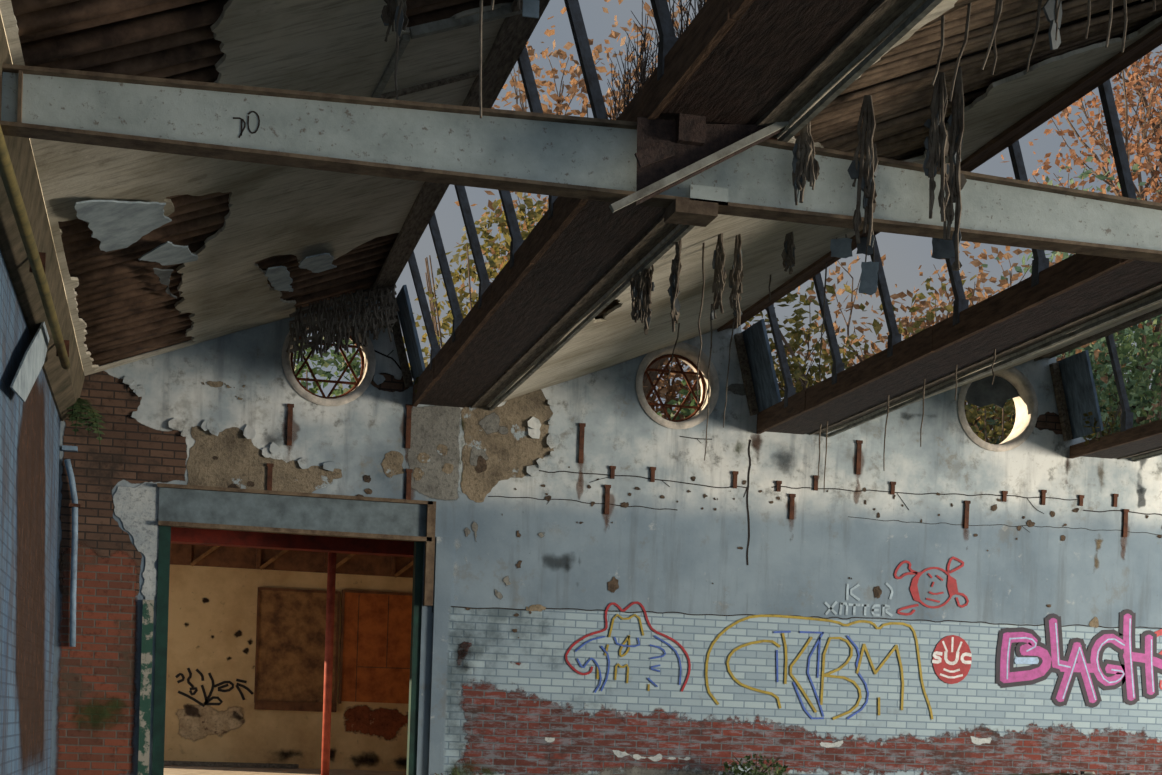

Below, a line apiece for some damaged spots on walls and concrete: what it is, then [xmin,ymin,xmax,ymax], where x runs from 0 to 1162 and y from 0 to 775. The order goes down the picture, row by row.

peeling [1043,0,1062,50]
peeling [75,200,172,252]
peeling [139,241,198,299]
peeling [265,253,337,292]
peeling [59,371,342,595]
peeling [16,378,46,769]
peeling [457,641,472,665]
peeling [176,705,245,741]
peeling [452,680,1162,775]